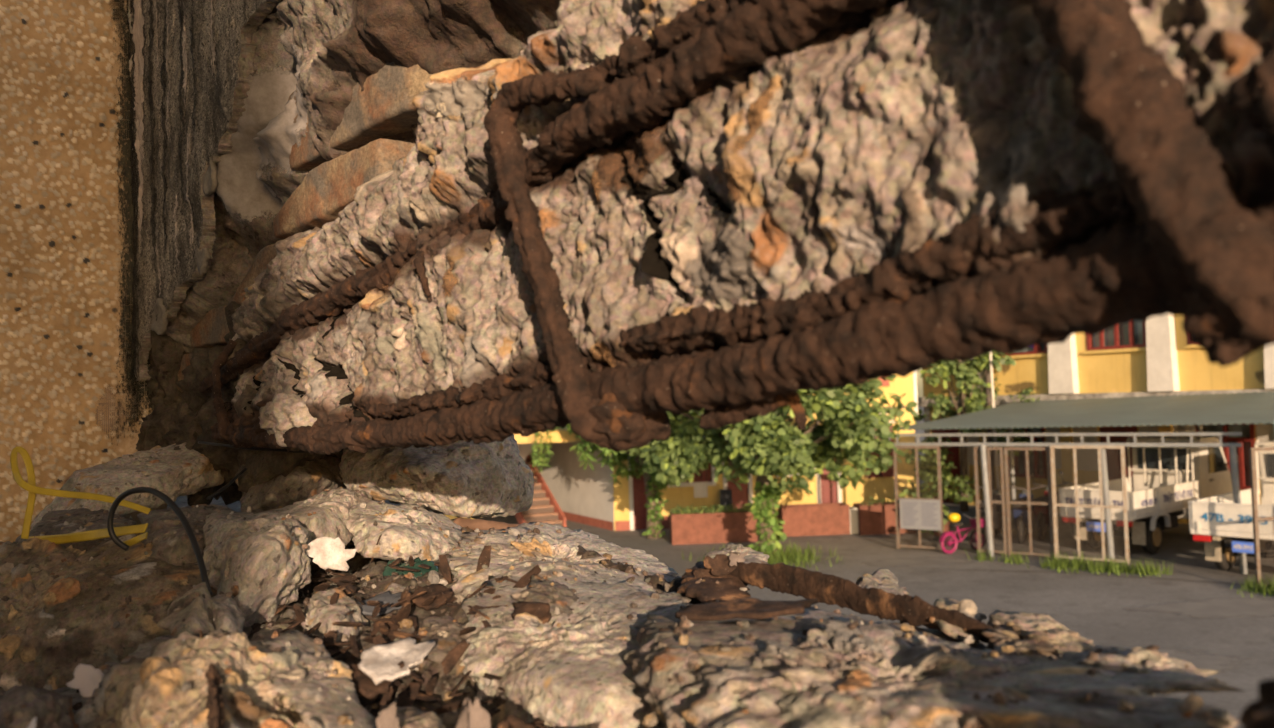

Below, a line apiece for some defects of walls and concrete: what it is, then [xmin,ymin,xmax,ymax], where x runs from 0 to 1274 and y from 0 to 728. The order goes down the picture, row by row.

corrosion [588,0,760,80]
corrosion [735,77,775,149]
corrosion [1226,49,1274,154]
corrosion [591,118,678,208]
spalling [177,34,492,392]
corrosion [442,257,458,297]
crack [621,160,732,303]
spalling [686,225,756,300]
corrosion [582,180,1136,368]
corrosion [373,363,554,418]
corrosion [675,551,993,646]